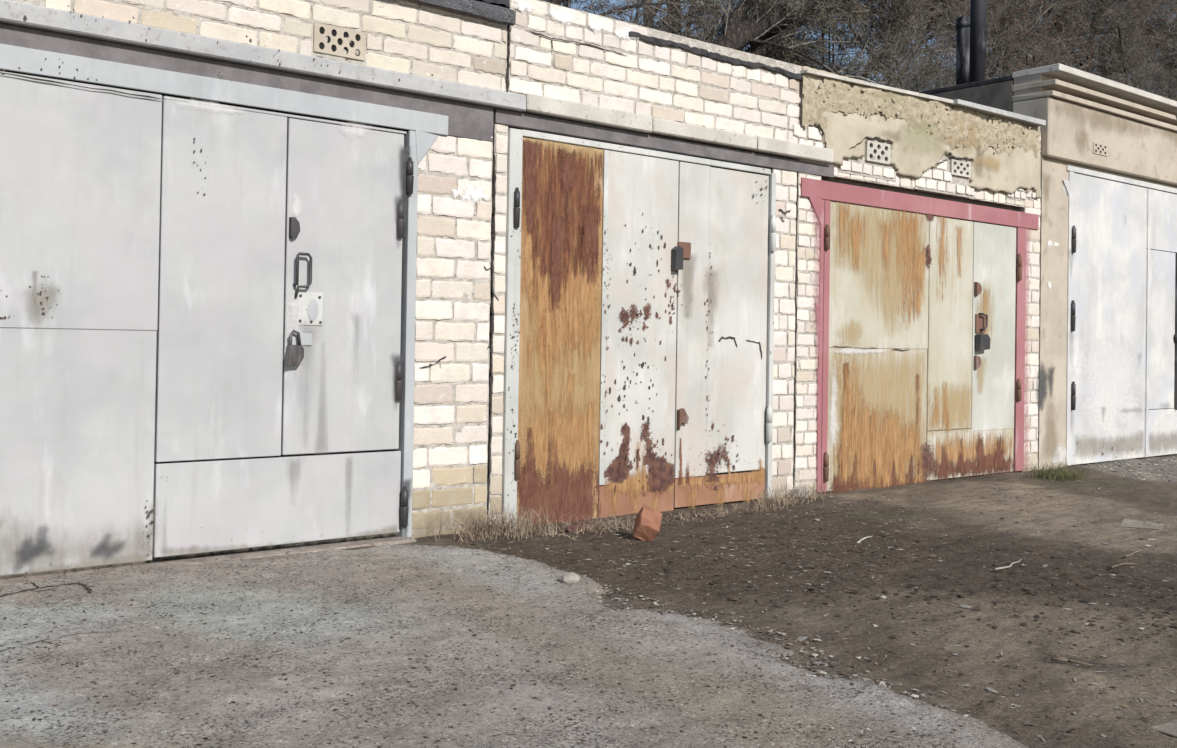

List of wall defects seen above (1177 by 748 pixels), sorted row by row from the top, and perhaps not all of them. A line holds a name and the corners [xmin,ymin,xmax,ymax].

flaking render [792,73,1039,198]
flaking render [1005,188,1037,201]
rust [836,205,961,322]
rust [517,140,765,527]
rust [831,325,1014,493]